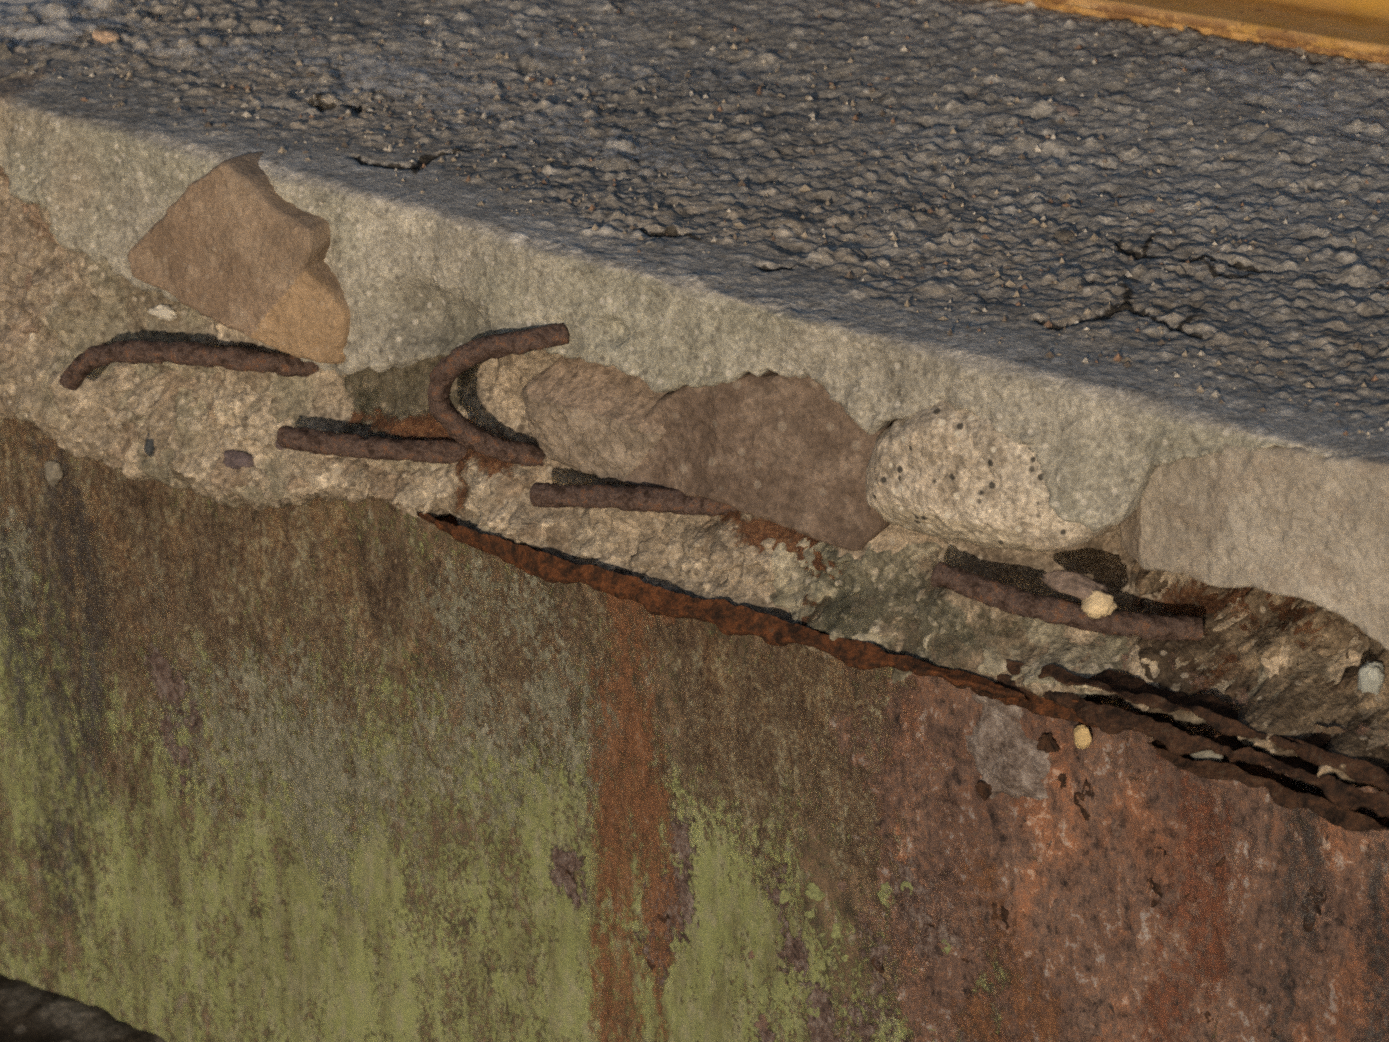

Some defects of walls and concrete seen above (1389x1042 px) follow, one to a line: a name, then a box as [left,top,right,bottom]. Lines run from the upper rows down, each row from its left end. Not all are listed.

spalling [0,167,72,365]
spalling [47,363,560,547]
leakage [0,436,113,926]
peeling [143,631,204,796]
leakage [149,554,630,912]
corrosion [0,408,1389,1042]
spalling [570,508,1389,787]
peeling [548,844,590,908]